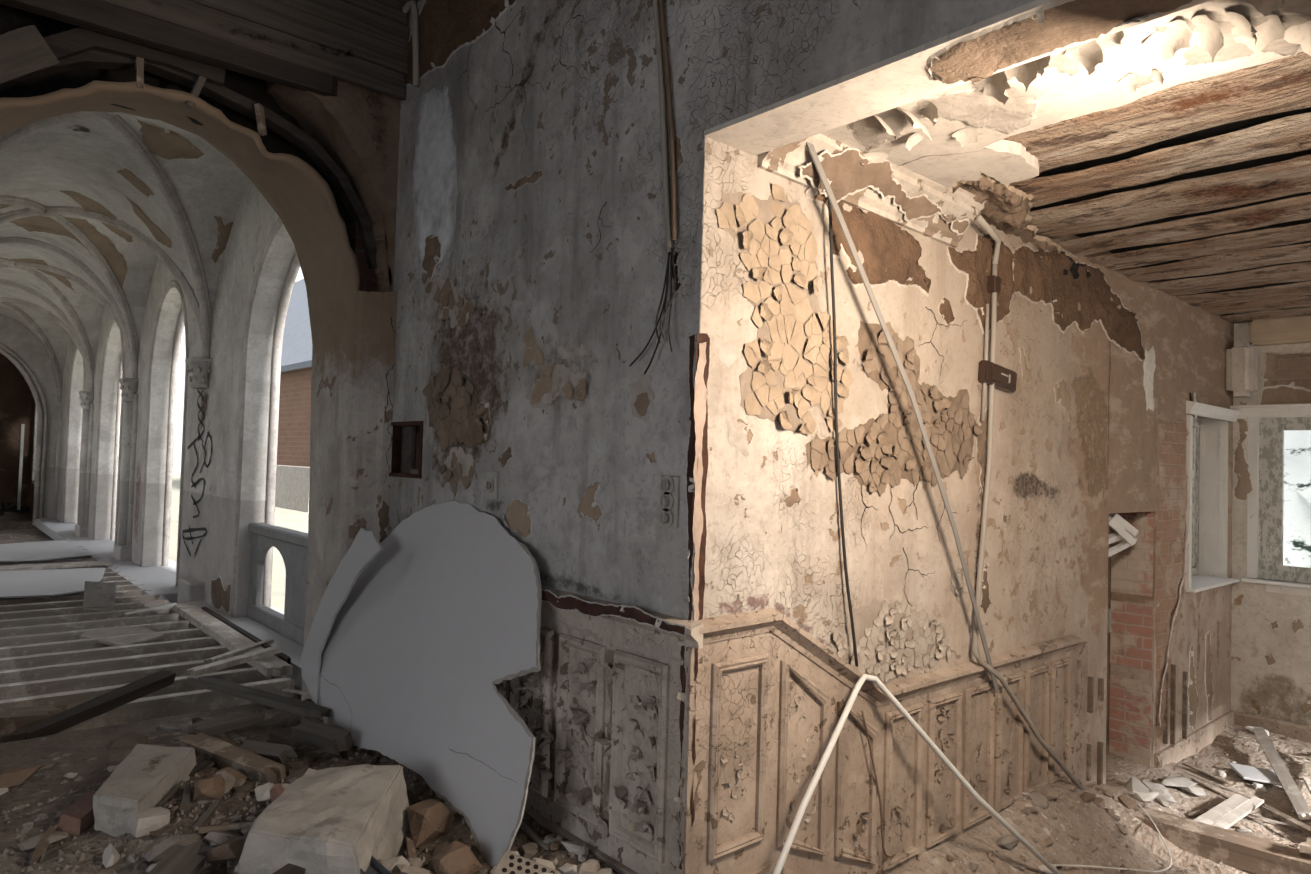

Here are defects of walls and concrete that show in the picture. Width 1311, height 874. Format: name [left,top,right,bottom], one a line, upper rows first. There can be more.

spalling [136,118,205,160]
spalling [0,190,134,293]
spalling [117,167,173,249]
spalling [211,215,234,264]
peeling [422,366,492,495]
spalling [498,446,513,467]
peeling [542,0,1311,870]
crack [861,481,958,606]